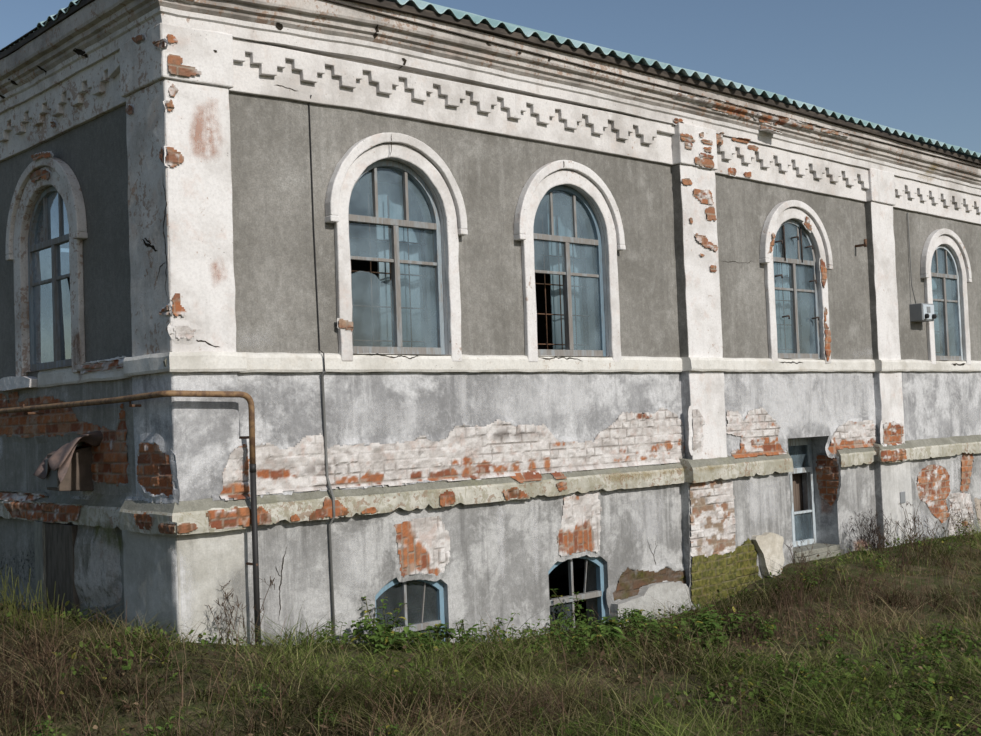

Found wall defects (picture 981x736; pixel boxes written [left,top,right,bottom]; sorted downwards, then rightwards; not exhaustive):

peeling [132,33,202,114]
peeling [672,117,759,169]
crack [142,173,168,299]
peeling [681,177,717,221]
flaking render [0,388,180,505]
flaking render [388,510,454,582]
flaking render [212,402,706,502]
flaking render [553,489,604,562]
flaking render [606,479,765,608]
flaking render [725,402,787,459]
flaking render [815,416,904,508]
flaking render [914,453,981,537]